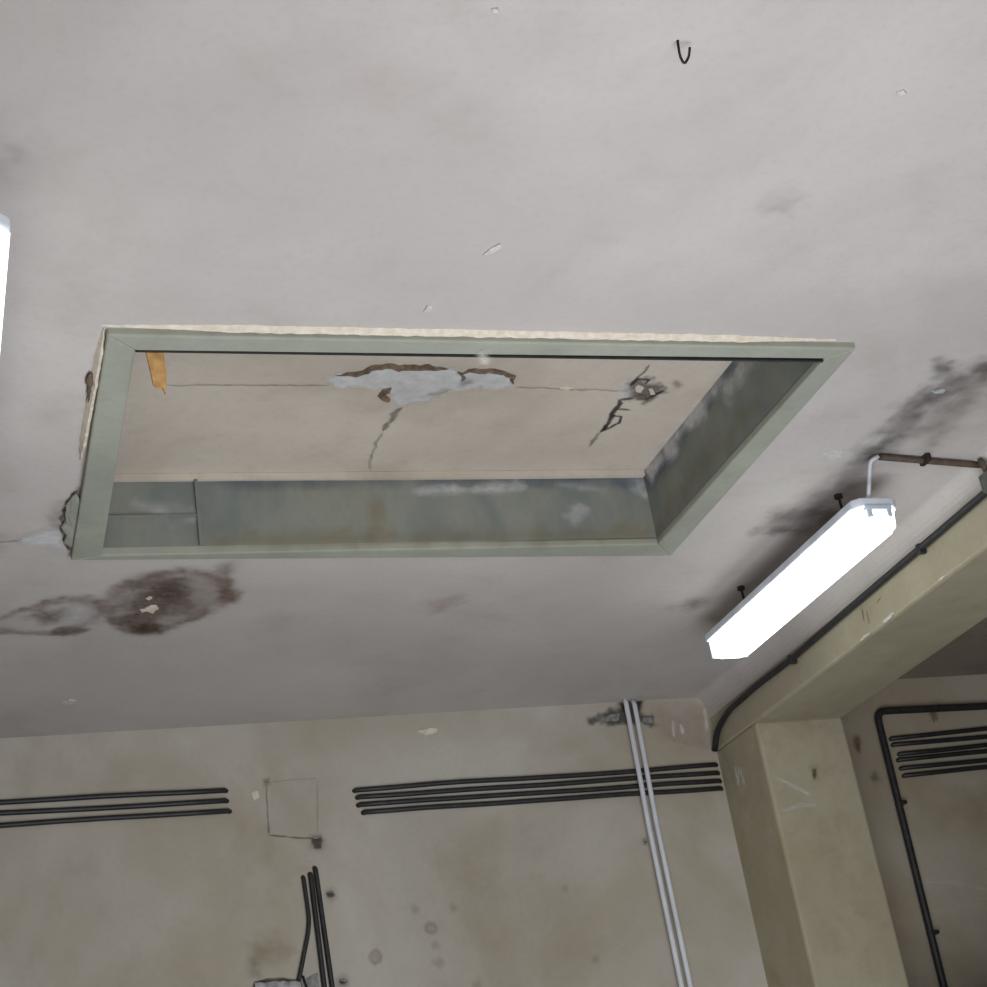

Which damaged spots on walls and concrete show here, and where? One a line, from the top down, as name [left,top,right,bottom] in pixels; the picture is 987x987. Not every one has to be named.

peeling [329,363,516,405]
leakage [133,596,159,630]